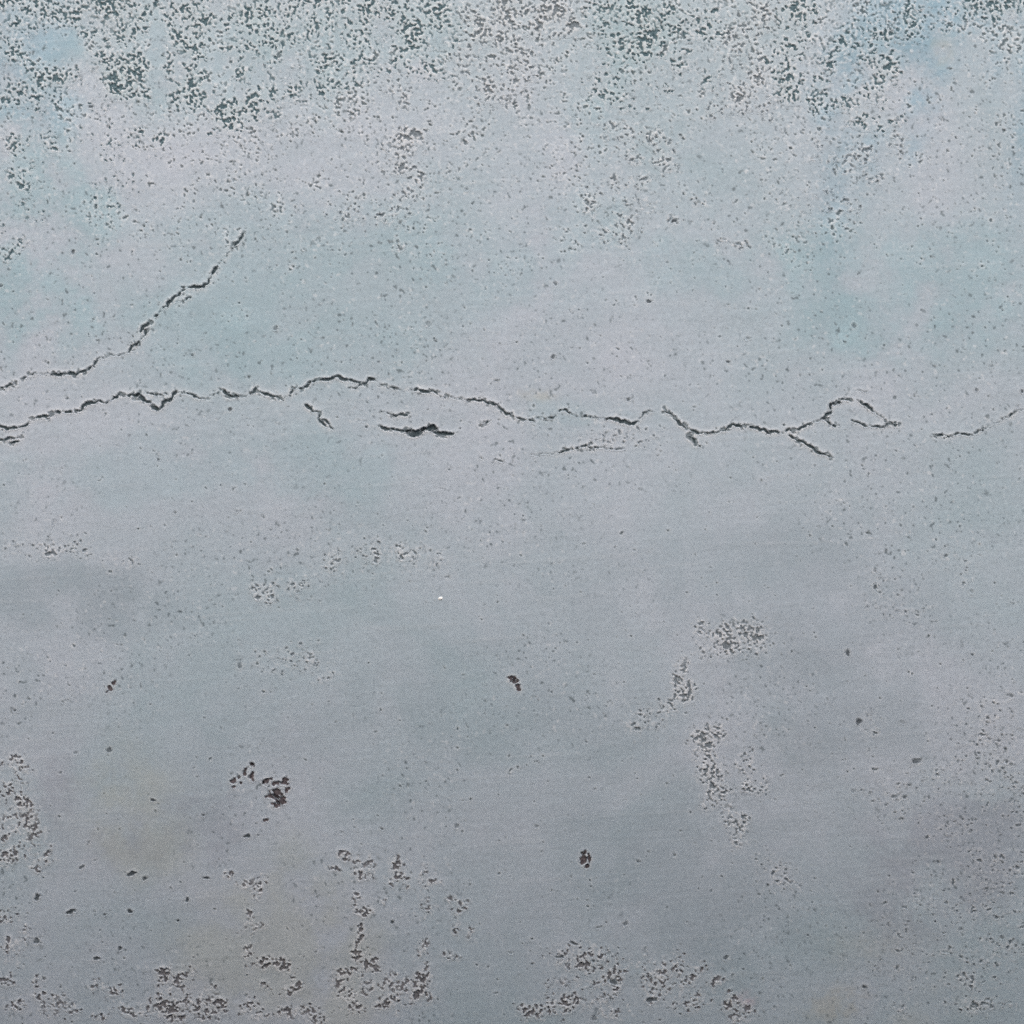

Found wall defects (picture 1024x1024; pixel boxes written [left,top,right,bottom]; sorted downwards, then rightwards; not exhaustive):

crack [0,230,246,390]
crack [0,374,898,459]
crack [478,454,504,465]
crack [930,408,1024,439]